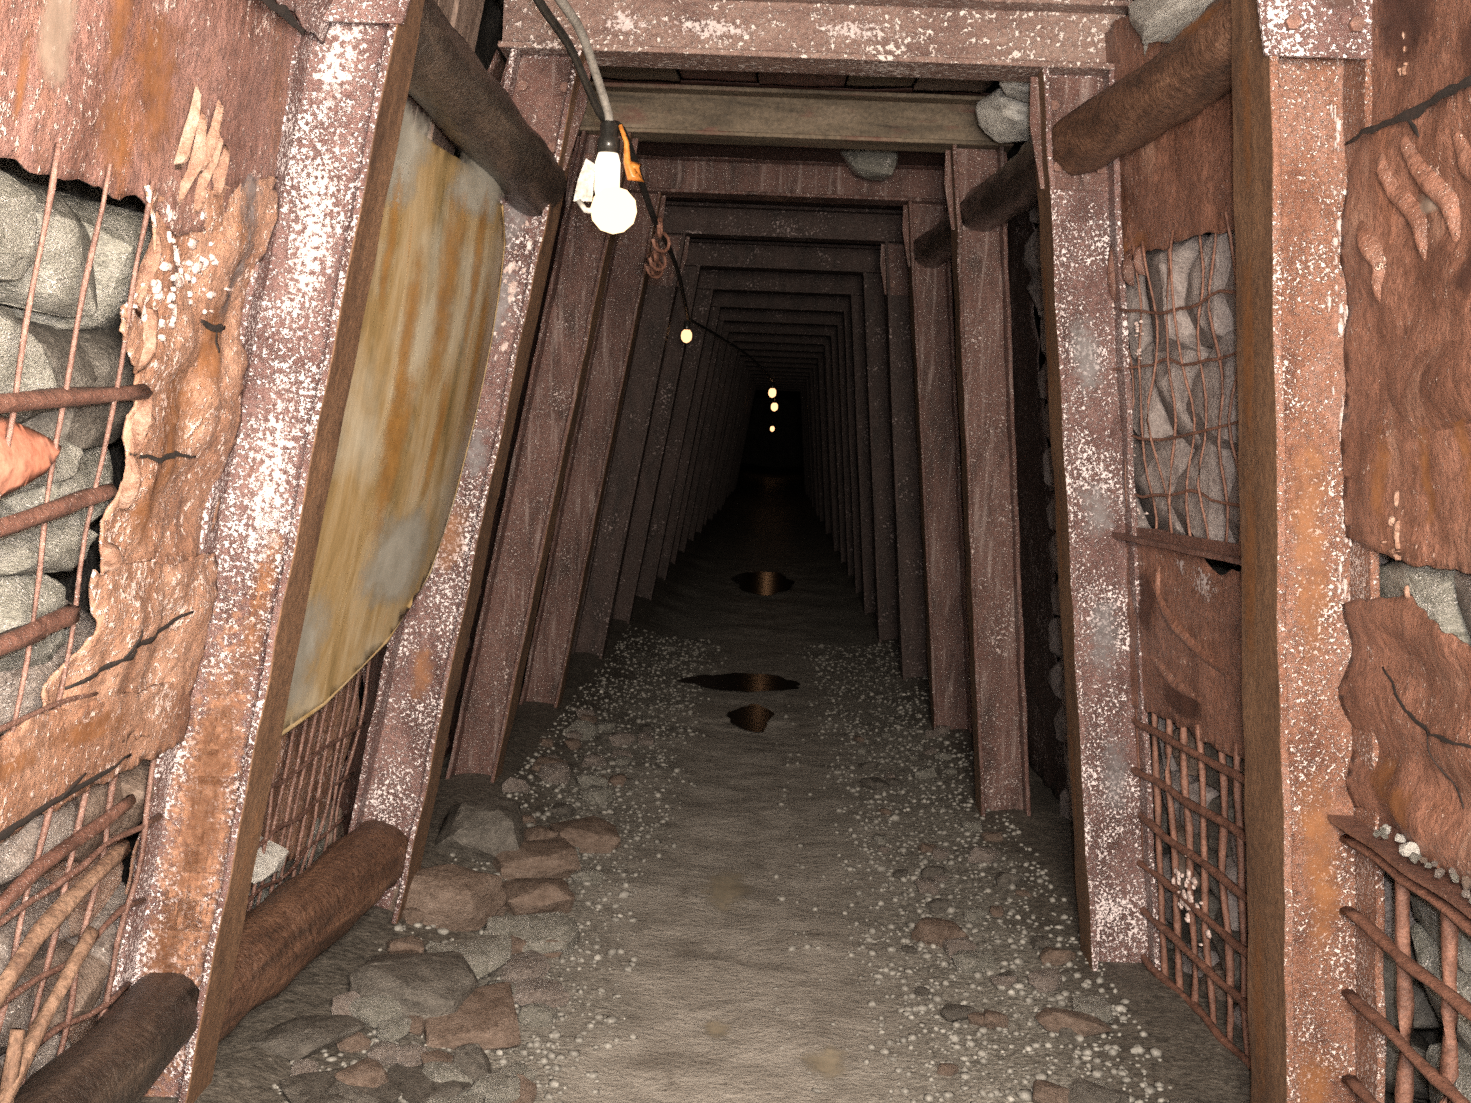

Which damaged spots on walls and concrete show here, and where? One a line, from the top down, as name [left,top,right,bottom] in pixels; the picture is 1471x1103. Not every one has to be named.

crack [1345,75,1471,145]
corrosion [0,0,333,522]
corrosion [102,542,123,573]
crack [65,611,194,690]
crack [1382,666,1471,809]